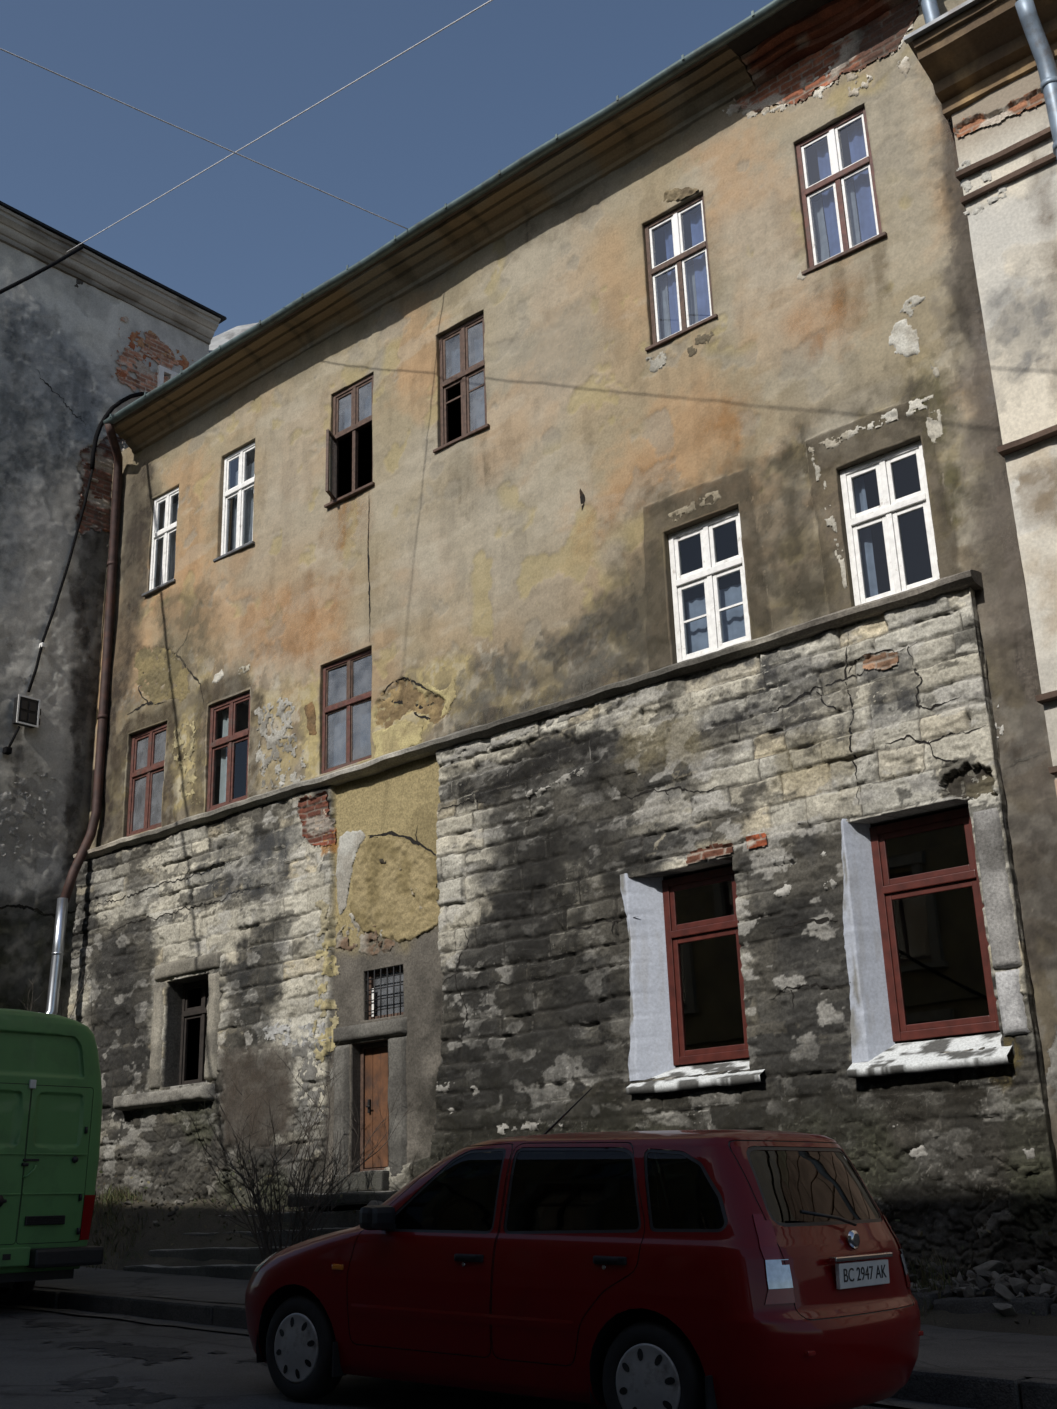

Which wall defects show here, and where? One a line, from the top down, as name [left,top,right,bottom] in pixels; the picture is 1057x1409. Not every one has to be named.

flaking render [722,0,920,119]
water stain [0,308,94,503]
peeling [808,395,944,489]
water stain [126,464,152,578]
crack [159,626,204,705]
flaking render [372,677,457,758]
crack [769,634,986,803]
water stain [458,732,599,806]
crack [369,799,490,856]
crack [0,859,272,932]
flaking render [254,697,395,1130]
water stain [944,1040,1018,1100]